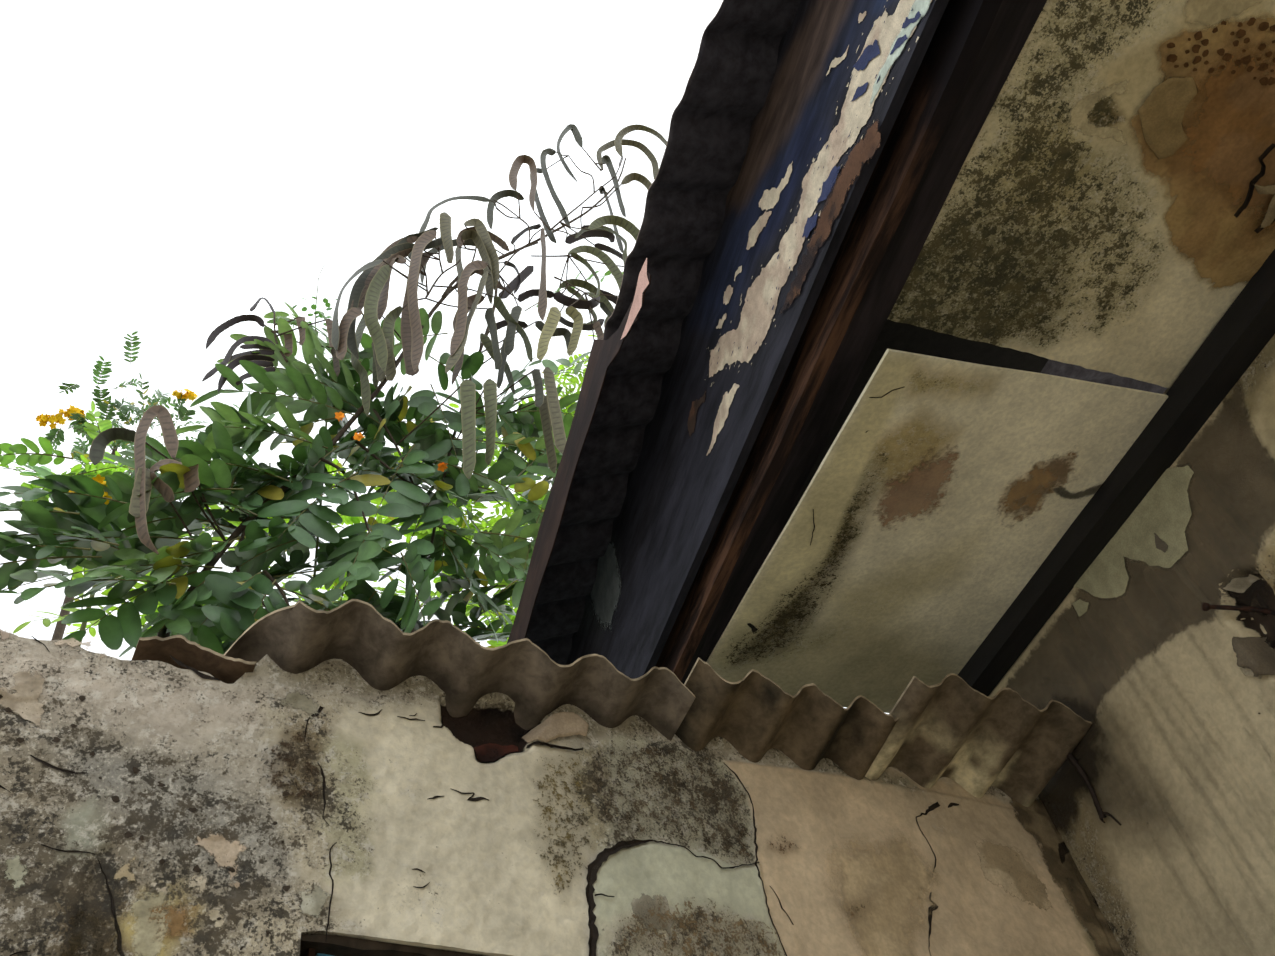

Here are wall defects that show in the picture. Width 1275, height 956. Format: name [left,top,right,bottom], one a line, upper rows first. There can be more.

peeling [687,0,932,456]
damp [1131,17,1275,288]
peeling [1006,380,1275,718]
spalling [441,705,589,763]
crack [41,844,125,956]
damp [533,744,752,902]
peeling [631,894,673,938]
crack [916,801,959,956]